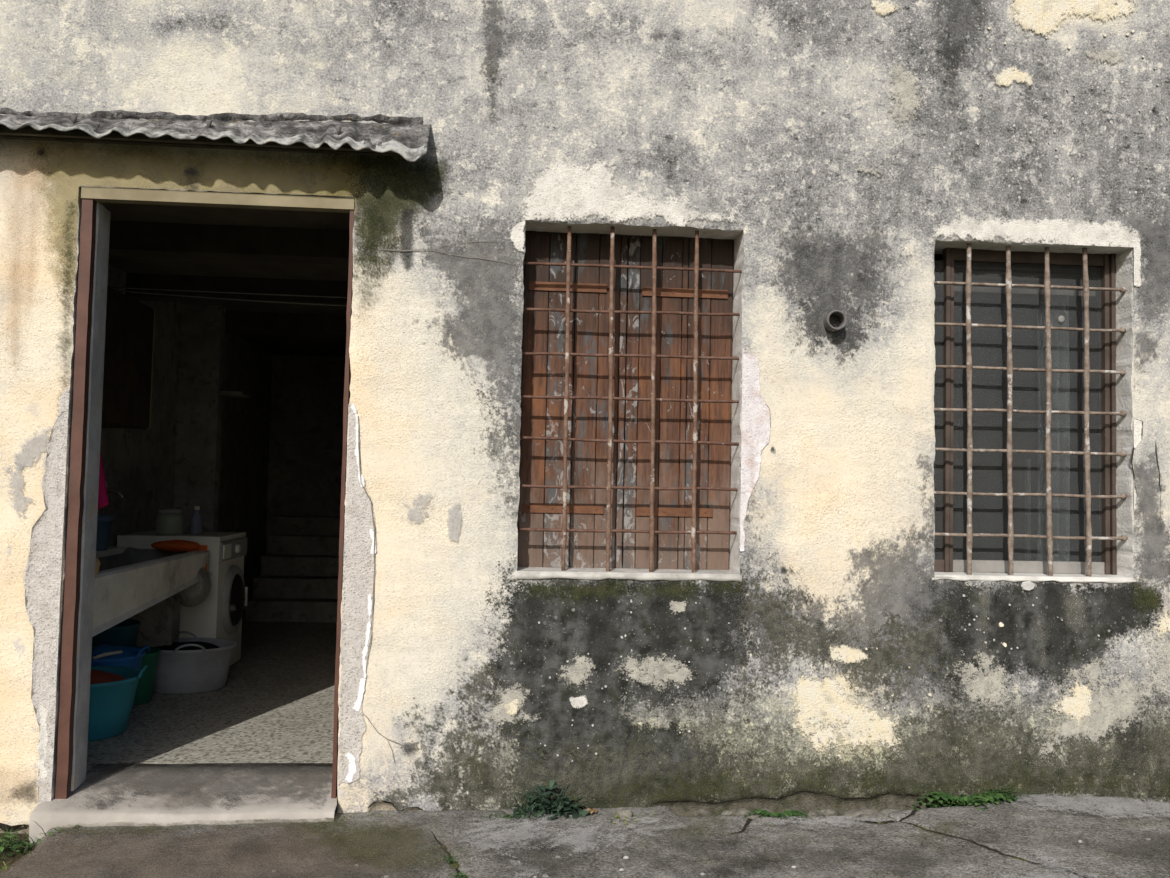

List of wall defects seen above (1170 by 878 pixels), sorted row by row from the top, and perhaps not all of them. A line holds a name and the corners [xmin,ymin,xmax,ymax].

flaking render [994,66,1033,86]
flaking render [1010,0,1139,63]
water stain [34,146,358,351]
water stain [400,210,525,516]
flaking render [740,350,775,551]
flaking render [3,387,69,805]
flaking render [338,404,376,783]
flaking render [560,652,597,708]
flaking render [616,653,692,691]
water stain [376,454,1170,878]
flaking render [784,645,911,761]
water stain [0,824,434,878]